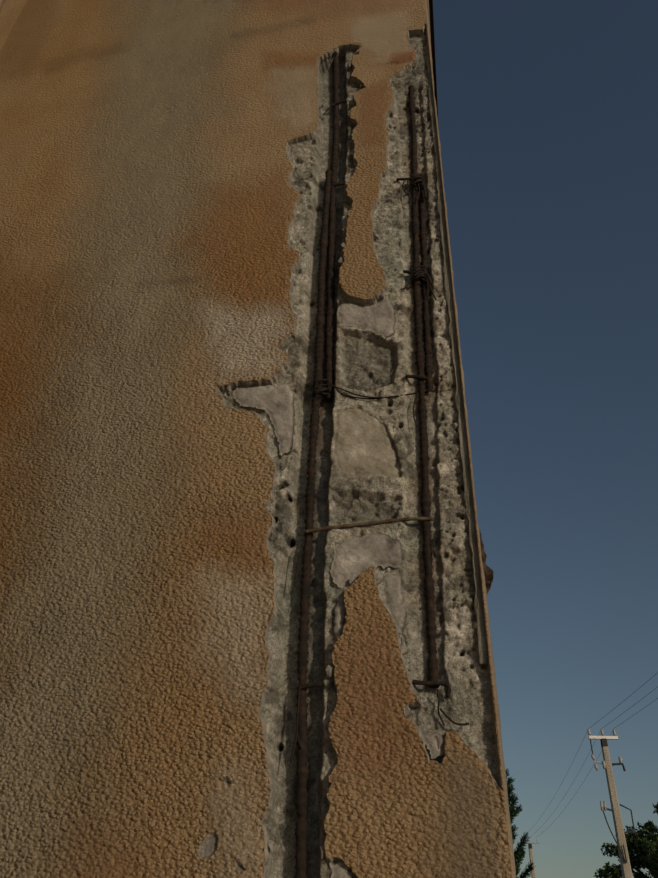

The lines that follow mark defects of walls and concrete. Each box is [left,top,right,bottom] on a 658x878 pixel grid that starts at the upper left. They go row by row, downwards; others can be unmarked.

spalling [215,23,502,878]